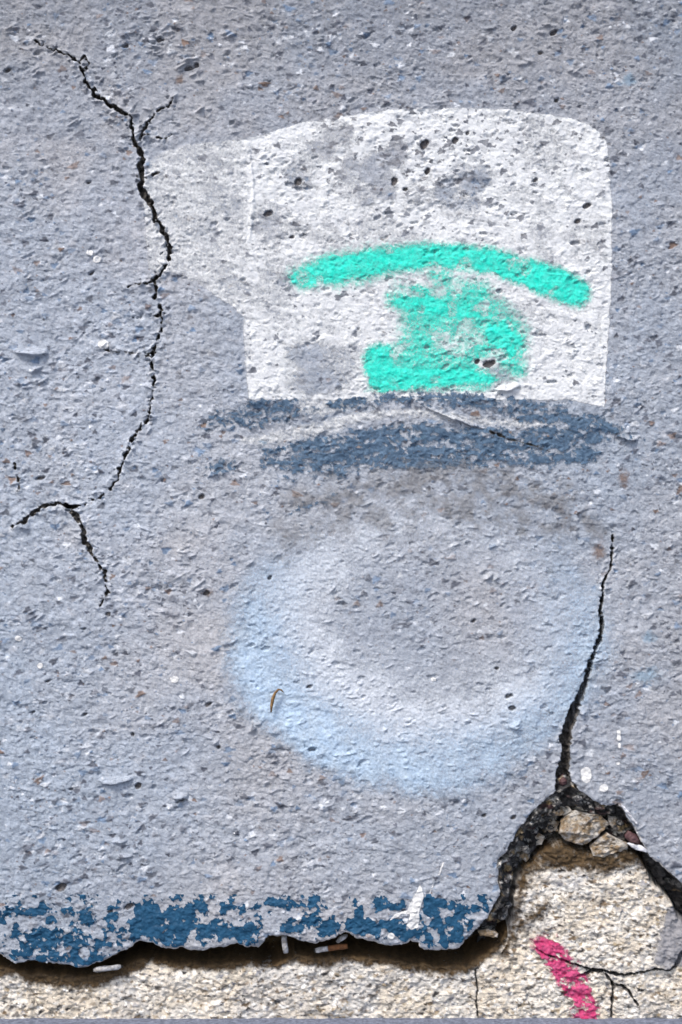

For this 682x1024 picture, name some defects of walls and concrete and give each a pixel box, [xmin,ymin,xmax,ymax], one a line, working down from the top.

crack [11,39,173,607]
crack [555,534,614,782]
peeling [0,773,682,968]
crack [548,954,679,1017]